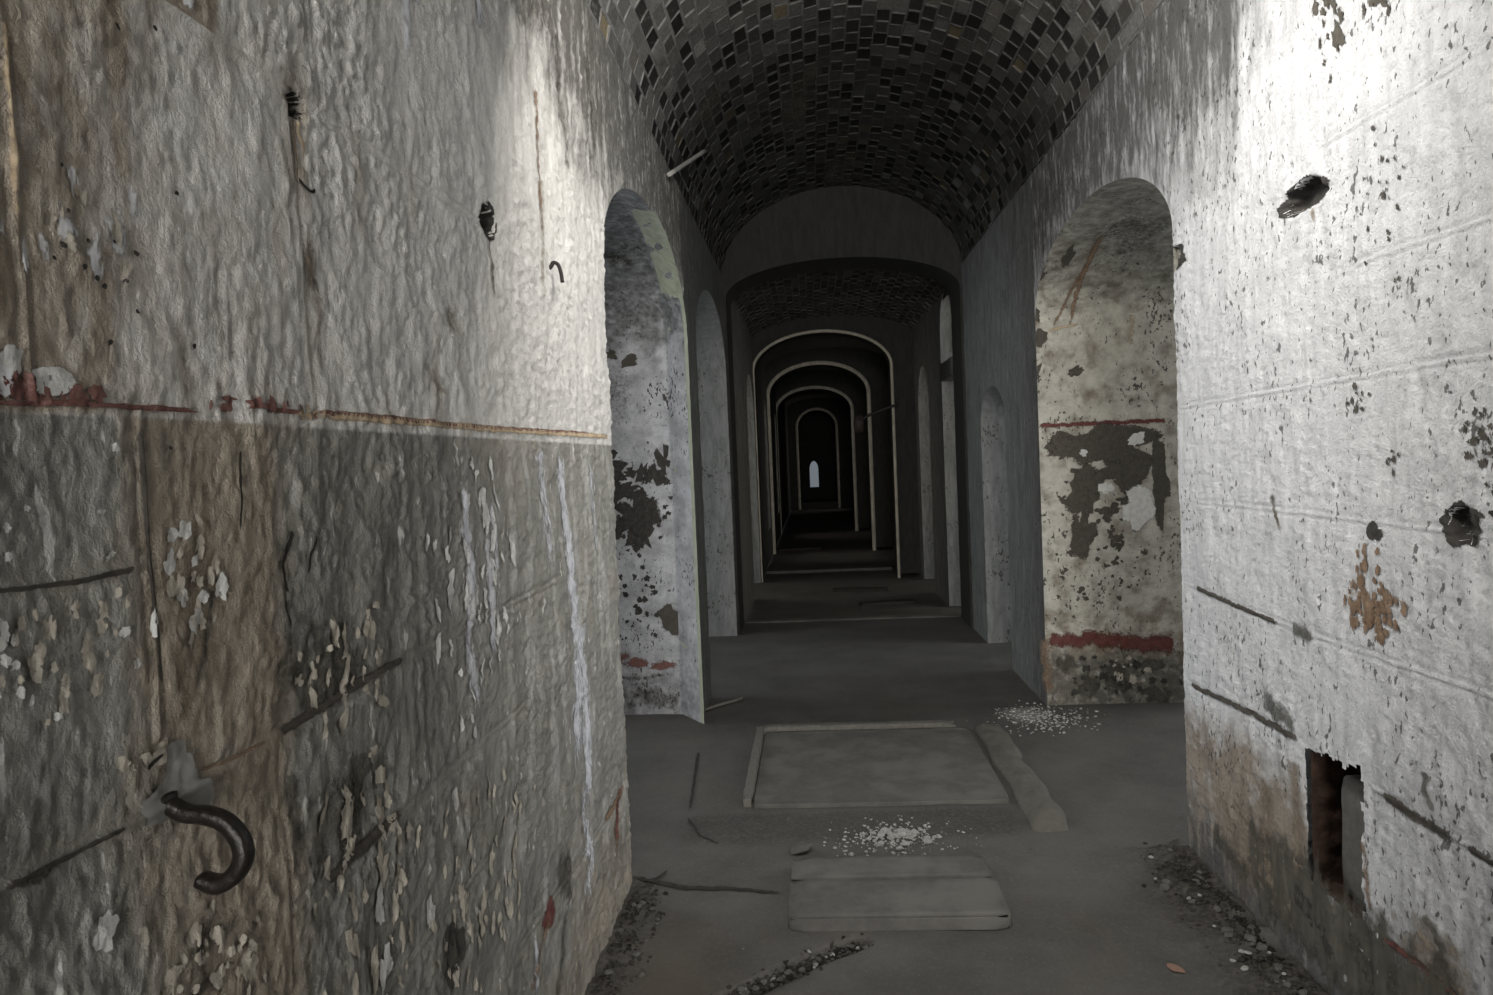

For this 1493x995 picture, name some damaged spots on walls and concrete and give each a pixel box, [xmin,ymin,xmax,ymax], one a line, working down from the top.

water stain [521,0,568,163]
peeling [1312,0,1345,84]
peeling [1361,0,1390,19]
peeling [611,444,679,670]
peeling [1043,423,1171,607]
corrosion [1343,543,1407,645]
water stain [1214,762,1469,995]